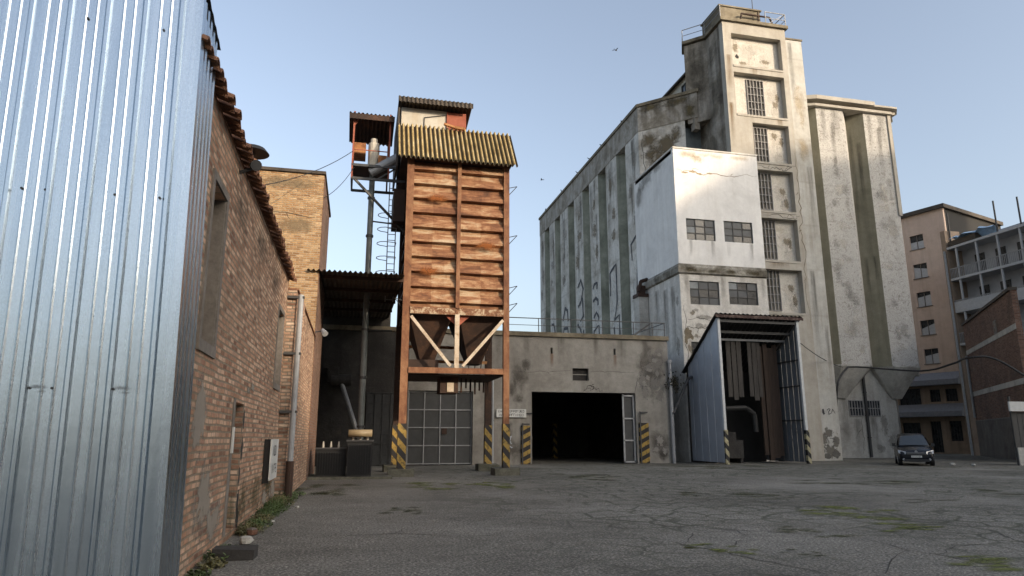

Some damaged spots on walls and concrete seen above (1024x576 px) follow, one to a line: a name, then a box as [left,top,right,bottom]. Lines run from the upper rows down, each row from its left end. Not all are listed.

water stain [642,128,680,162]
crack [679,157,811,322]
spalling [823,427,841,459]